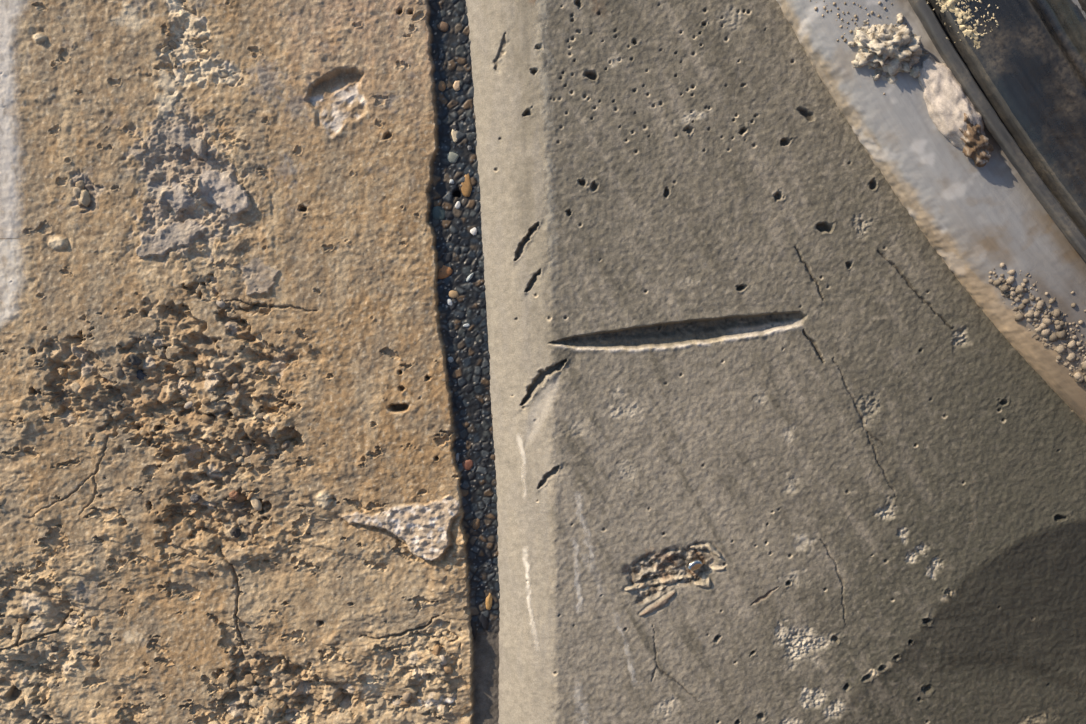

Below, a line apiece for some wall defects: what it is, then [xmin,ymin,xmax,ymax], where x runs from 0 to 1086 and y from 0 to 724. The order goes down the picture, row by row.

spalling [18,0,308,552]
crack [27,435,110,520]
crack [218,545,252,644]
spalling [618,538,726,617]
damp [1010,707,1070,724]